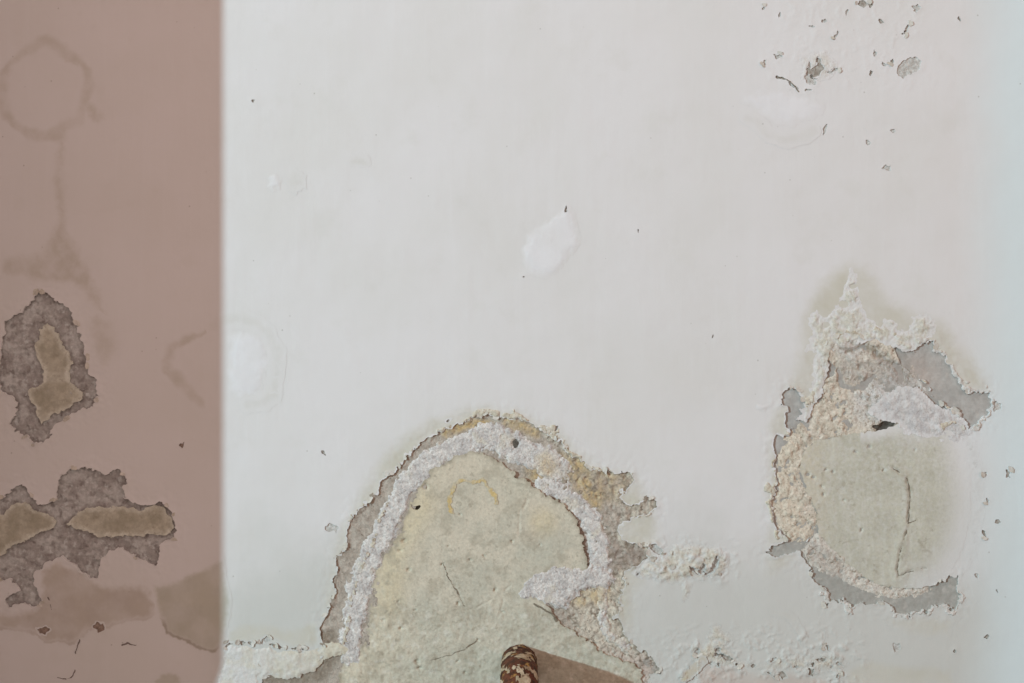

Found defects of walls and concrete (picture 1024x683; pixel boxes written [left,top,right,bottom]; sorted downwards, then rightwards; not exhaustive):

peeling [776,31,842,92]
peeling [869,52,921,79]
peeling [901,4,921,38]
flaking render [0,288,99,447]
flaking render [763,268,1001,619]
flaking render [0,465,178,607]
flaking render [216,409,731,683]
peeling [690,623,850,681]